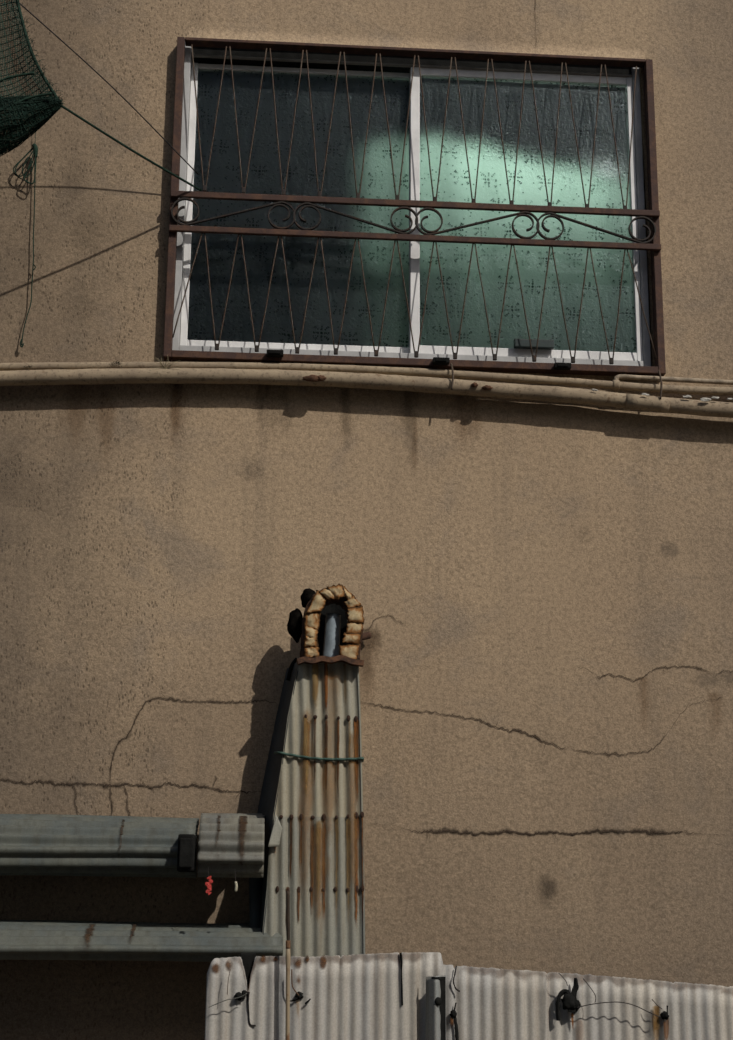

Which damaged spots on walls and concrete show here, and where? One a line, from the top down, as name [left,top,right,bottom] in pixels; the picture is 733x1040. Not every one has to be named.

crack [0,688,273,816]
crack [364,666,728,755]
crack [373,823,713,840]